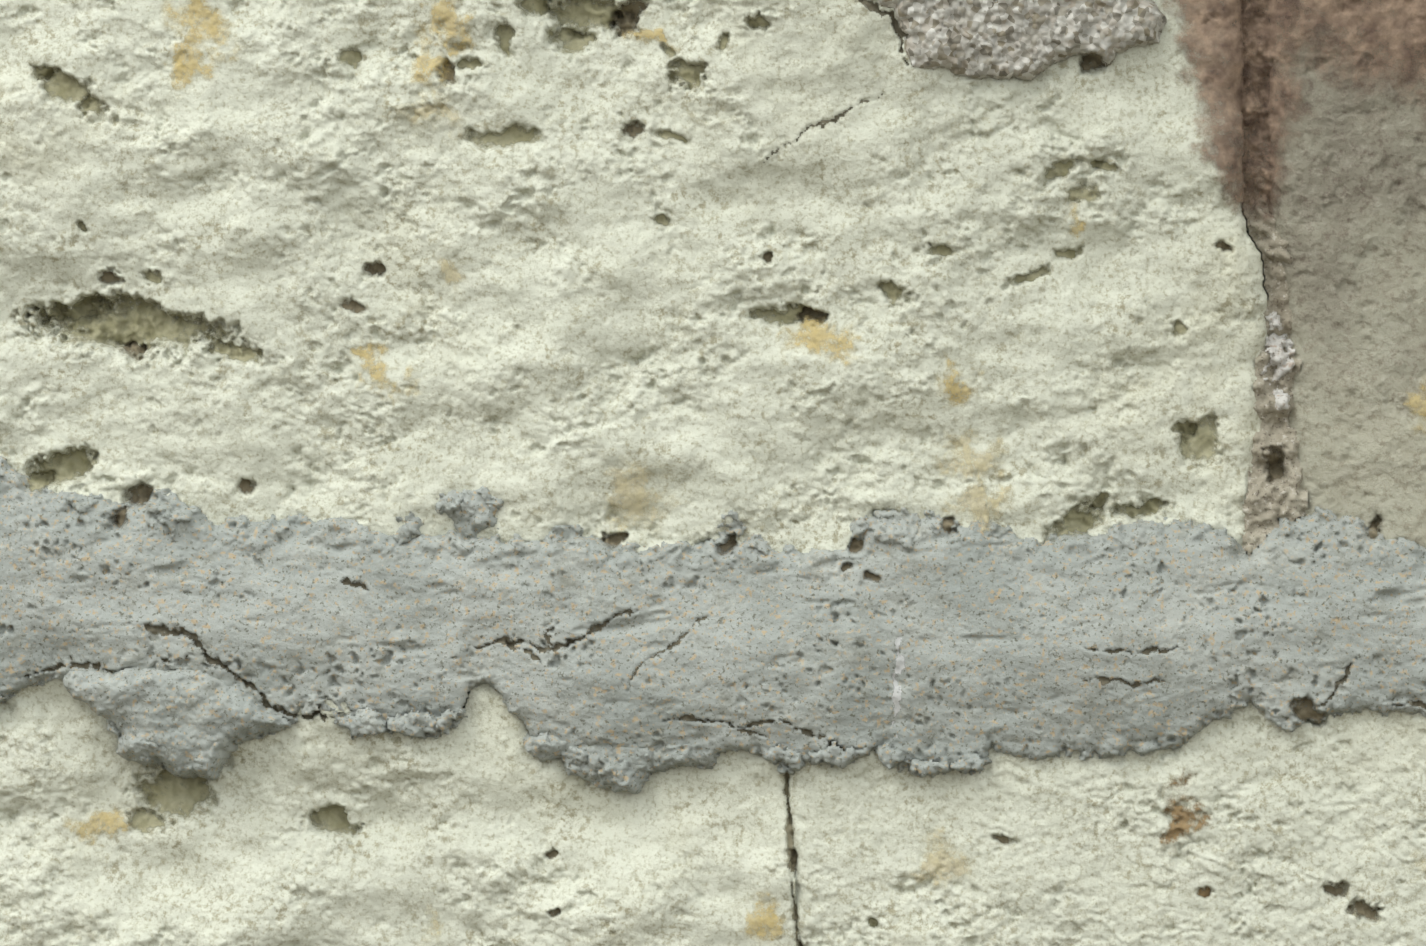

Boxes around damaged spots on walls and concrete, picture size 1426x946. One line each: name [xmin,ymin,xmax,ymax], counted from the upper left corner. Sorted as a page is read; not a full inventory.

crack [144,624,334,722]
crack [679,714,875,751]
crack [784,772,803,946]